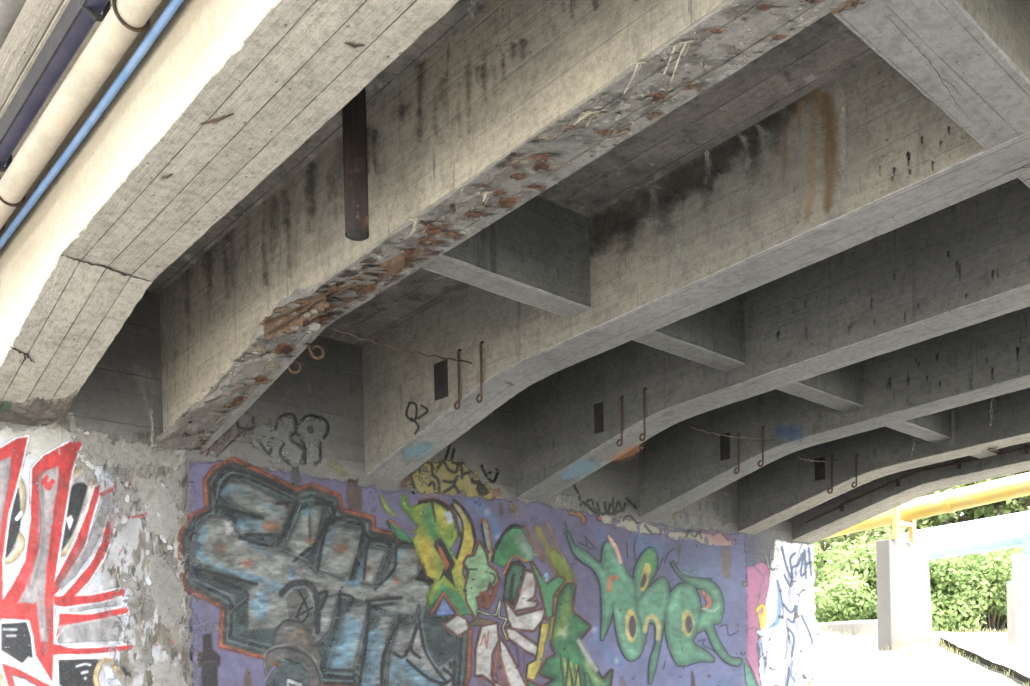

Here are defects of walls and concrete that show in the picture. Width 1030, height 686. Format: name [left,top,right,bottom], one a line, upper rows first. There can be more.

spalling [830,0,892,16]
crack [62,255,151,282]
peeling [70,1,818,633]
spalling [0,389,78,426]
peeling [143,655,189,686]